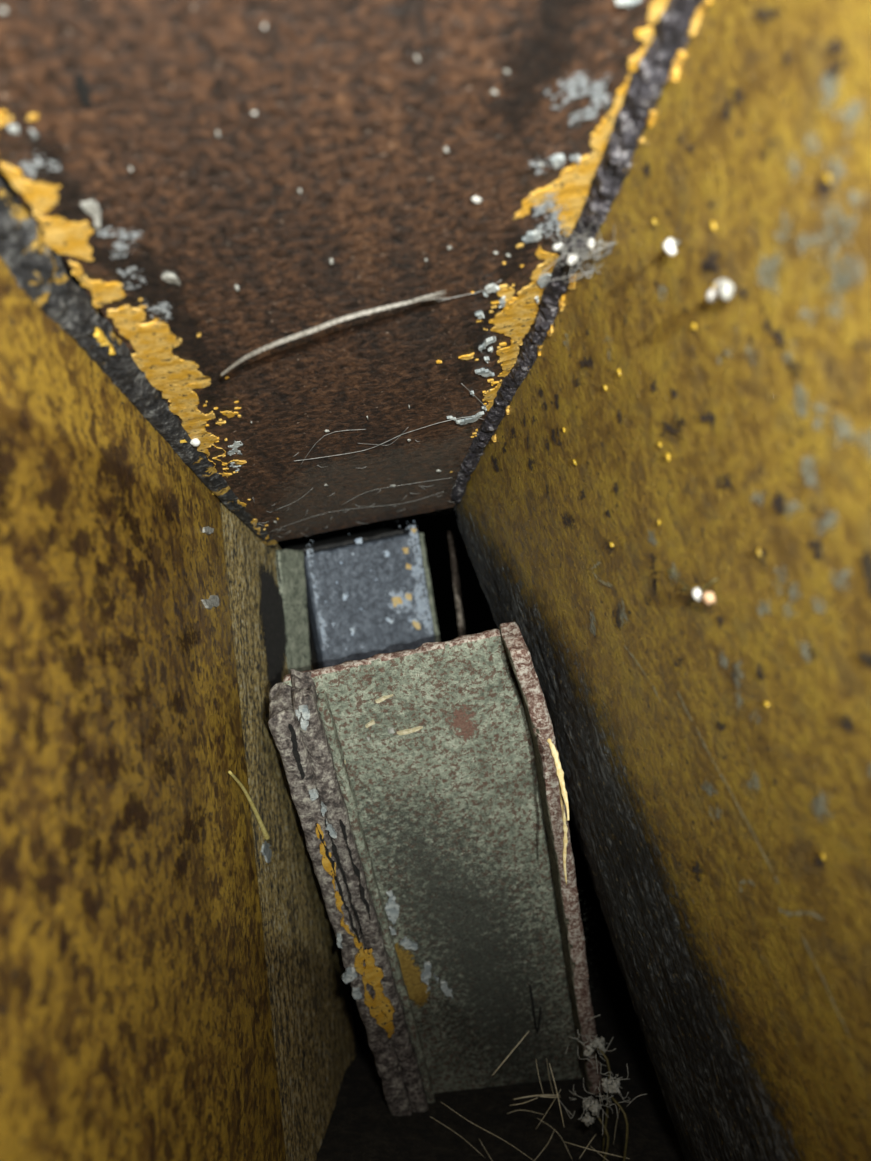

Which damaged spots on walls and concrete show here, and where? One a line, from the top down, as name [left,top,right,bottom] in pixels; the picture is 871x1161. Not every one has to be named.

peeling [688,0,712,36]
peeling [0,110,38,140]
spalling [74,73,93,109]
peeling [513,0,669,237]
peeling [668,50,686,82]
peeling [0,162,247,478]
peeling [447,229,559,472]
peeling [558,274,576,312]
spalling [762,317,804,382]
peeling [237,499,279,539]
peeling [309,789,395,1038]
peeling [385,890,453,999]